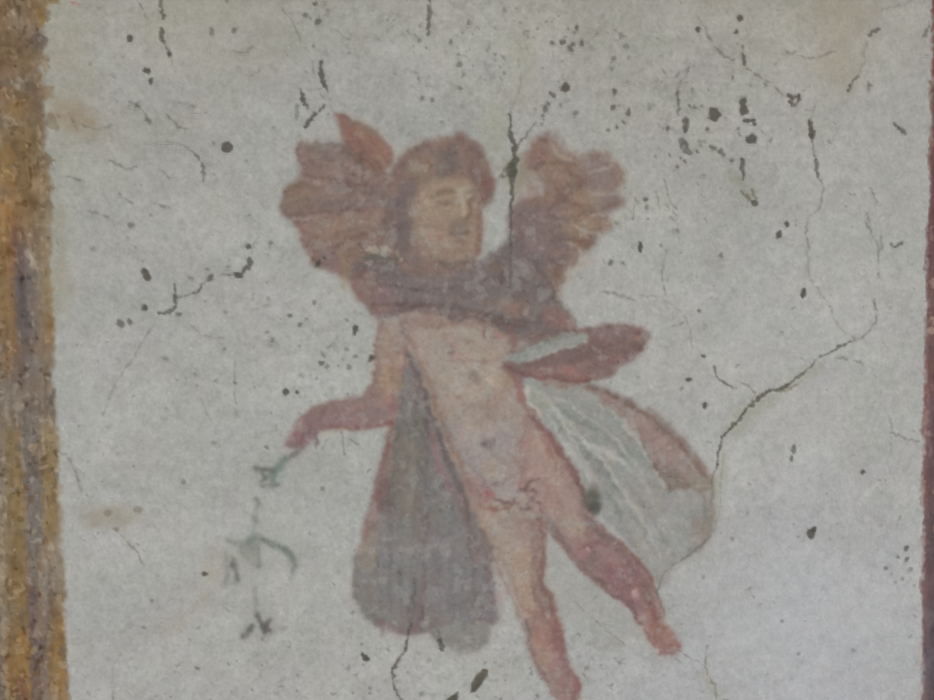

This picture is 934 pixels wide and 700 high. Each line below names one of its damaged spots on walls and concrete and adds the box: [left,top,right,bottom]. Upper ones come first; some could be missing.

crack [846,0,914,97]
crack [497,56,537,291]
crack [597,62,694,352]
spalling [705,106,724,123]
spalling [708,144,735,164]
spalling [737,95,759,146]
crack [891,122,909,137]
crack [100,236,260,418]
crack [655,15,905,598]
crack [389,622,413,700]
crack [435,628,447,653]
spalling [444,667,489,700]